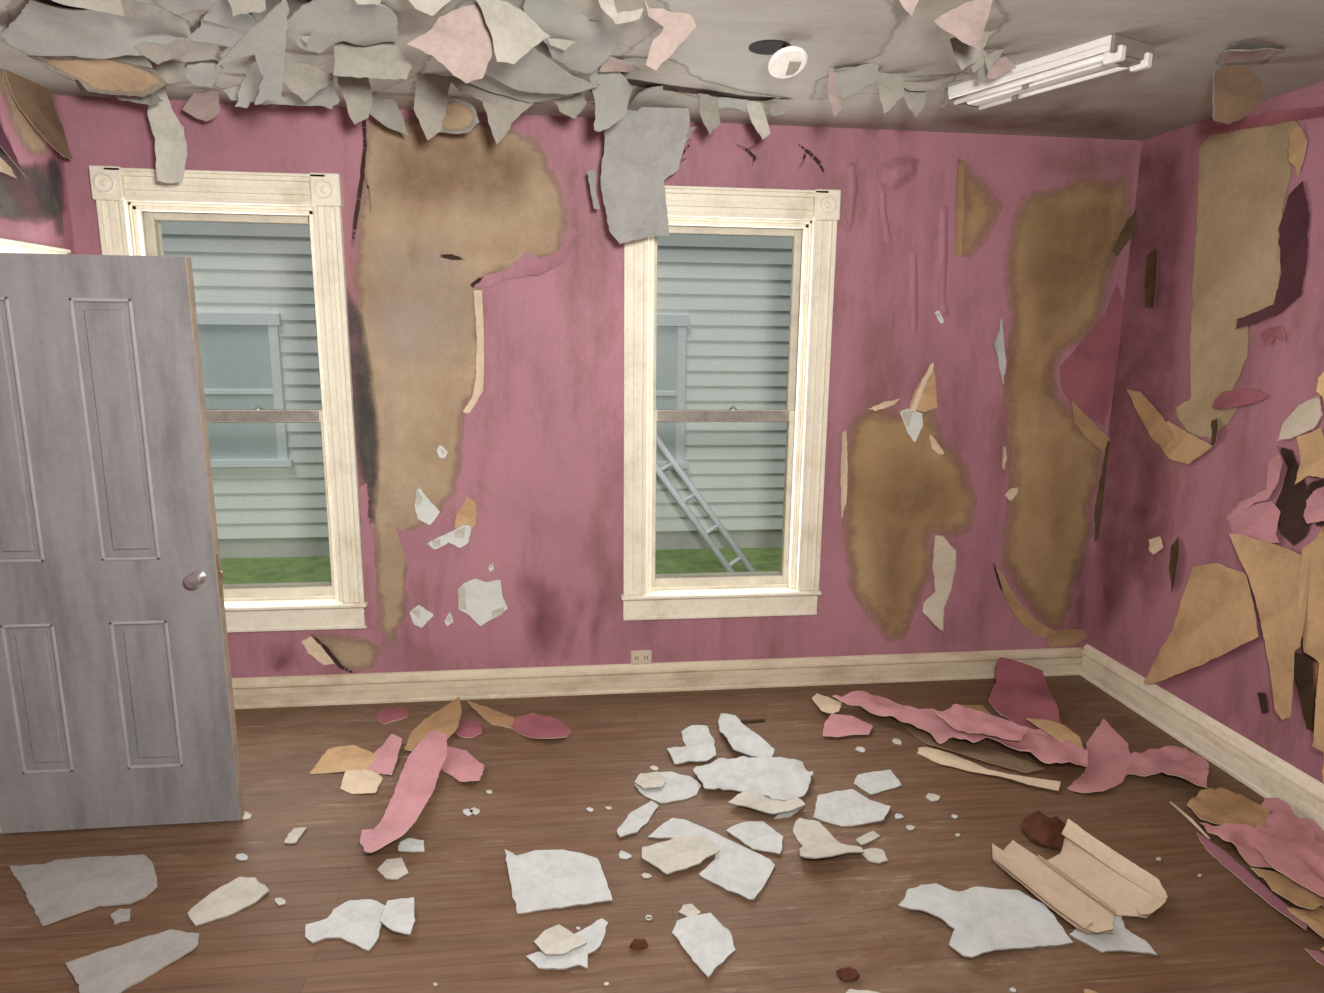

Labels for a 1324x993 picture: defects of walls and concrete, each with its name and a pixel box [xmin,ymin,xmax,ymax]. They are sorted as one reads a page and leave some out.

peeling [786,61,802,76]
peeling [812,0,1016,118]
peeling [1212,39,1285,124]
peeling [1,0,793,244]
spalling [900,409,923,442]
spalling [415,485,471,550]
spalling [409,563,508,628]